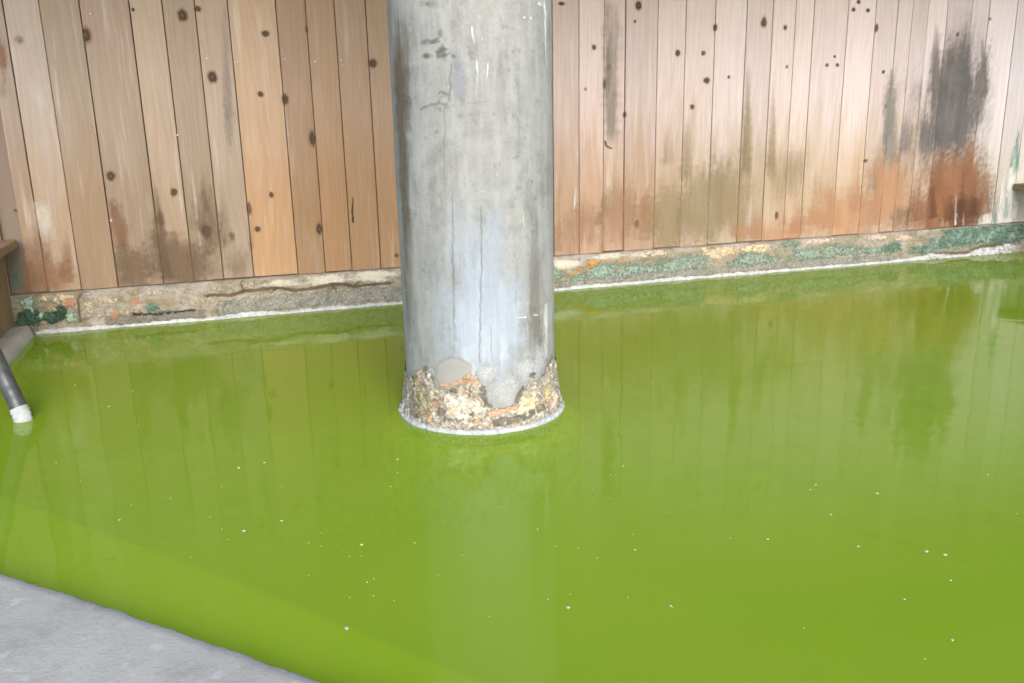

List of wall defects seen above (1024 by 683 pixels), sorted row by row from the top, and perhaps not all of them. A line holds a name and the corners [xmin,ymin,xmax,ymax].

leakage [607,84,616,134]
leakage [885,88,907,159]
leakage [921,48,987,148]
leakage [727,141,1024,268]
corrosion [914,153,992,229]
leakage [119,206,206,285]
crack [132,280,391,316]
spalling [398,355,564,447]